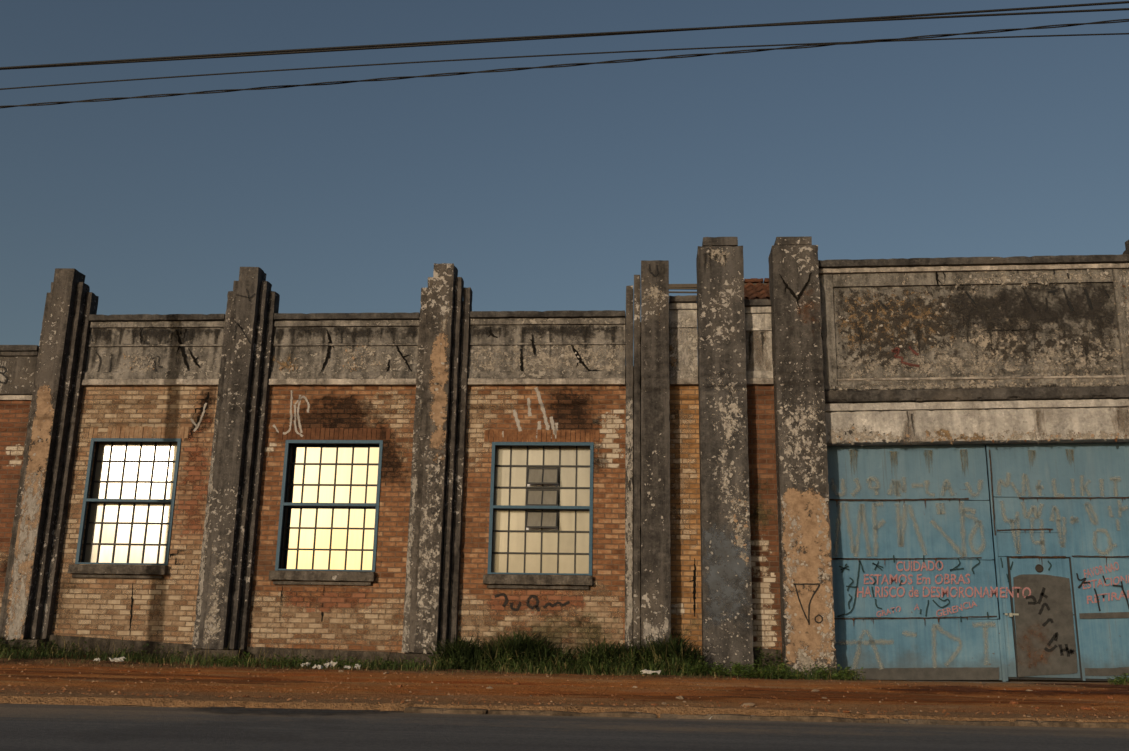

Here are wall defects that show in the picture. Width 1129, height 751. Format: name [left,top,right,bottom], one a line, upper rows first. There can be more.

spalling [5,385,56,640]
crack [176,329,209,436]
crack [321,330,334,372]
damp [361,393,413,462]
spalling [402,333,449,654]
crack [571,345,599,371]
spalling [594,400,685,646]
peeling [670,278,751,670]
spalling [778,269,1129,675]
mould [835,283,1120,399]